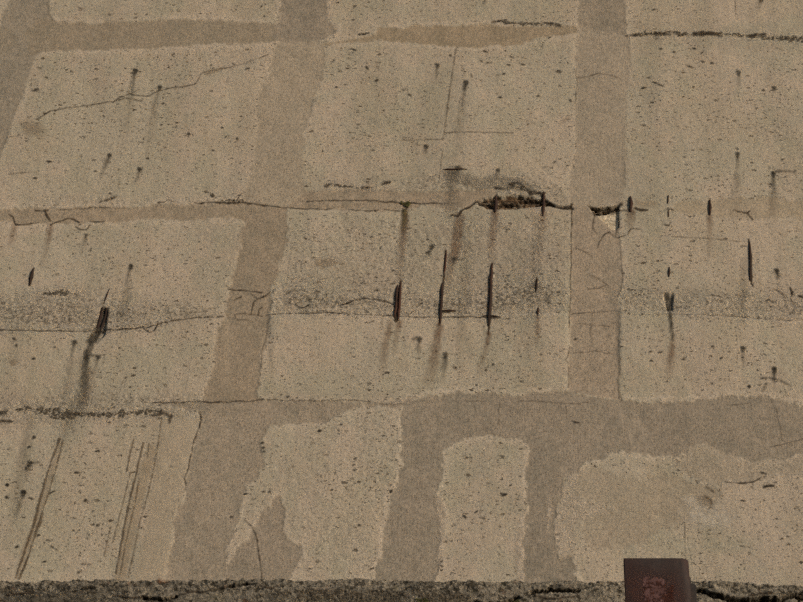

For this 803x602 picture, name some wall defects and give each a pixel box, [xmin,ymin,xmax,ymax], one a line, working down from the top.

spalling [443,168,549,215]
crack [9,207,104,230]
crack [195,194,477,217]
spalling [588,196,633,231]
leakage [84,309,105,368]
crack [473,587,577,602]
crack [698,588,803,602]